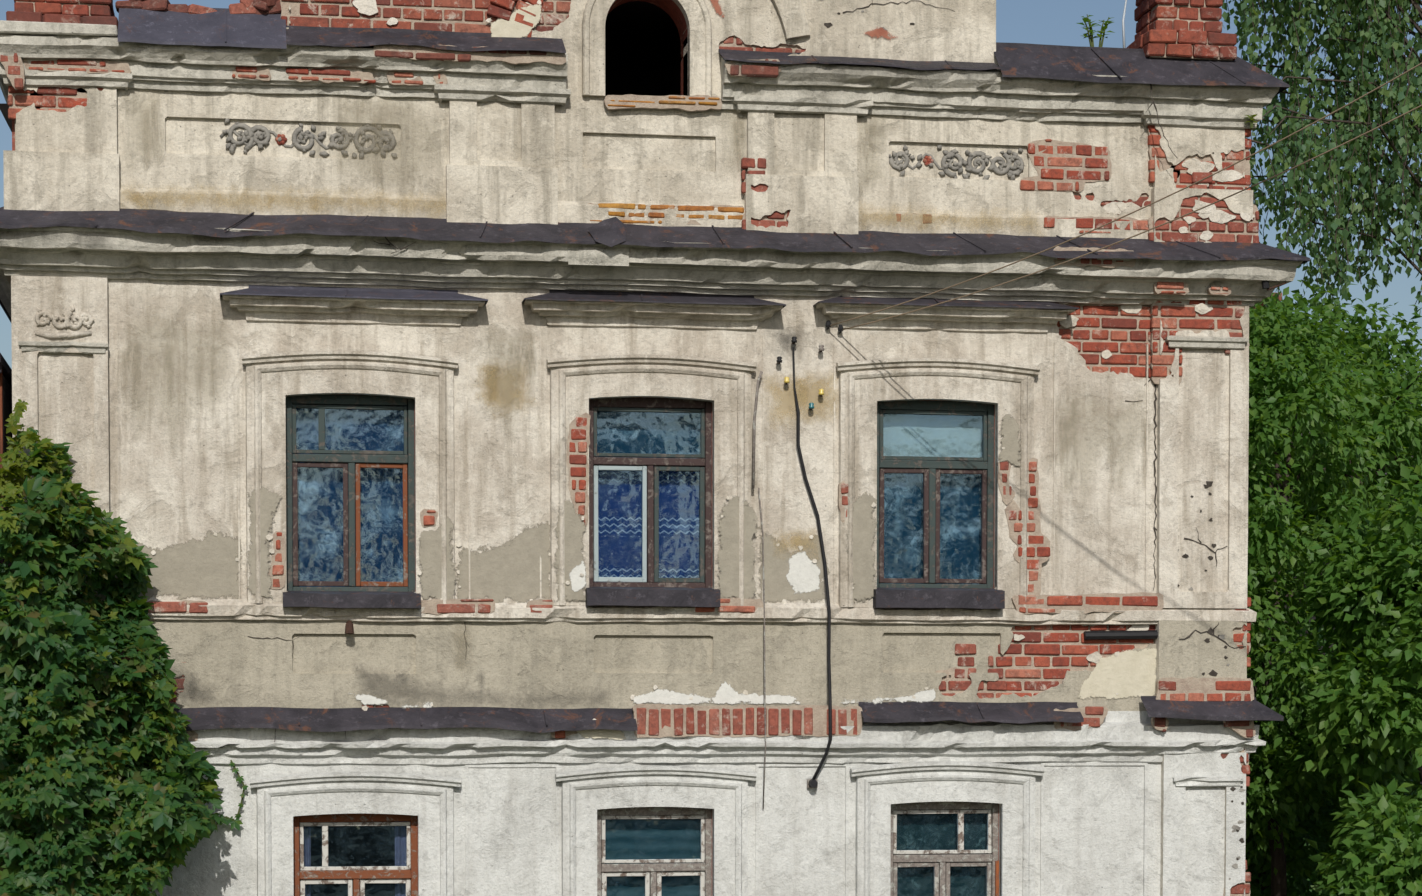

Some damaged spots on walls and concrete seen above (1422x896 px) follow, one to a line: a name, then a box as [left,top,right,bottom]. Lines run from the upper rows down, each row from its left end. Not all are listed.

flaking render [0,53,131,120]
flaking render [232,0,571,86]
crack [843,0,954,13]
flaking render [1019,125,1259,268]
flaking render [1051,282,1250,385]
peeling [417,413,591,615]
peeling [695,496,830,613]
flaking render [935,458,1193,699]
flaking render [1155,597,1254,702]
flaking render [630,685,863,738]
flaking render [1053,706,1108,731]
flaking render [1221,720,1255,896]